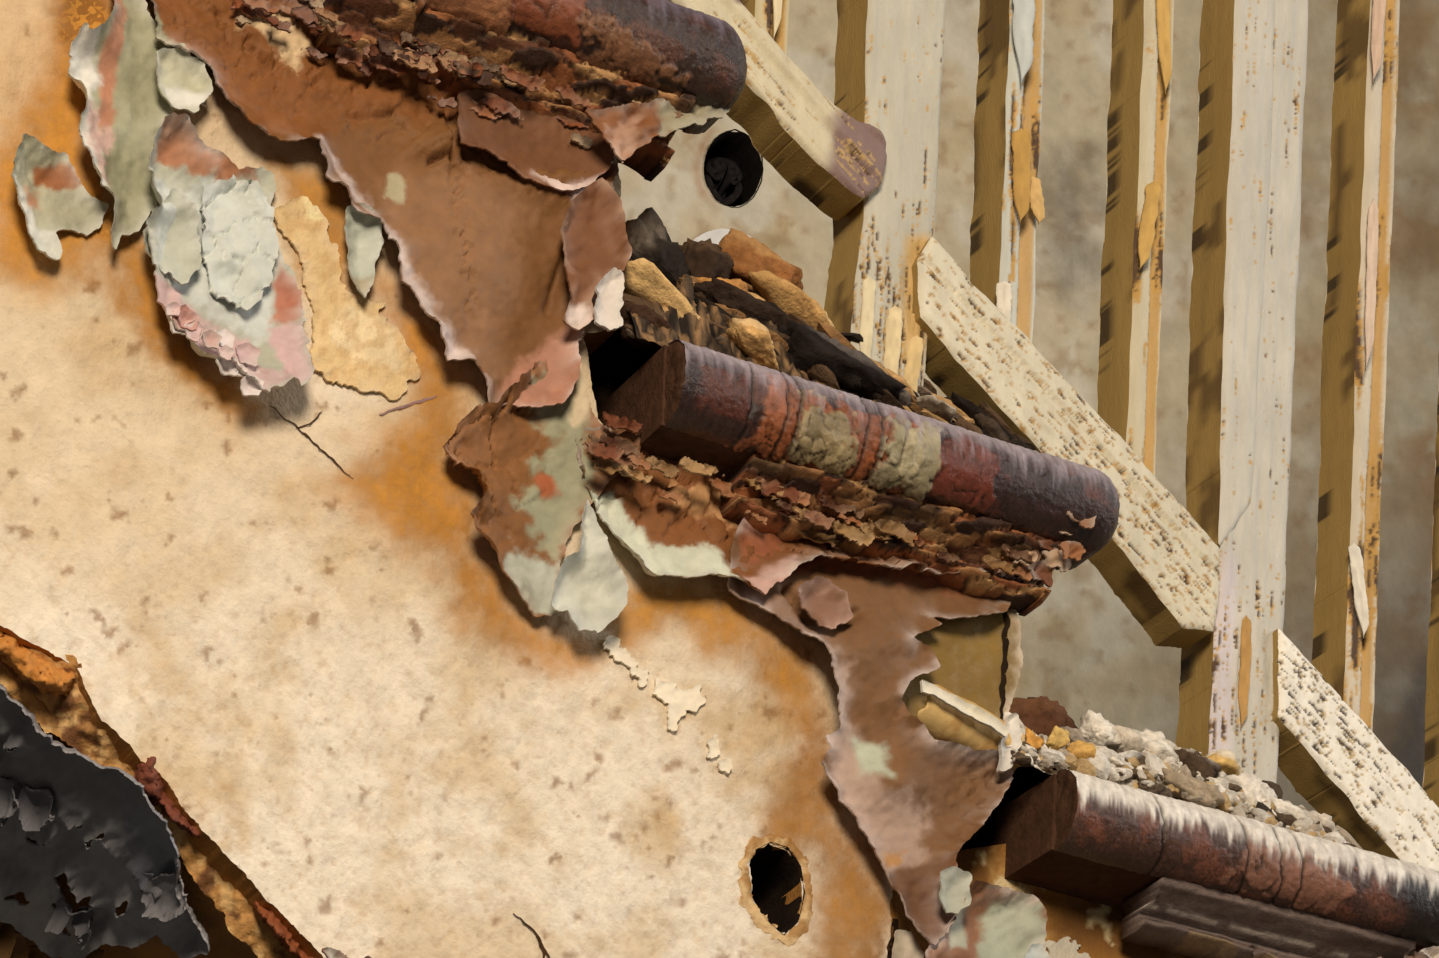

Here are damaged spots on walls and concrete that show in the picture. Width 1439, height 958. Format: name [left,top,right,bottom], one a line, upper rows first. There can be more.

peeling [0,0,1097,958]
crack [513,913,550,958]
peeling [1404,946,1439,958]